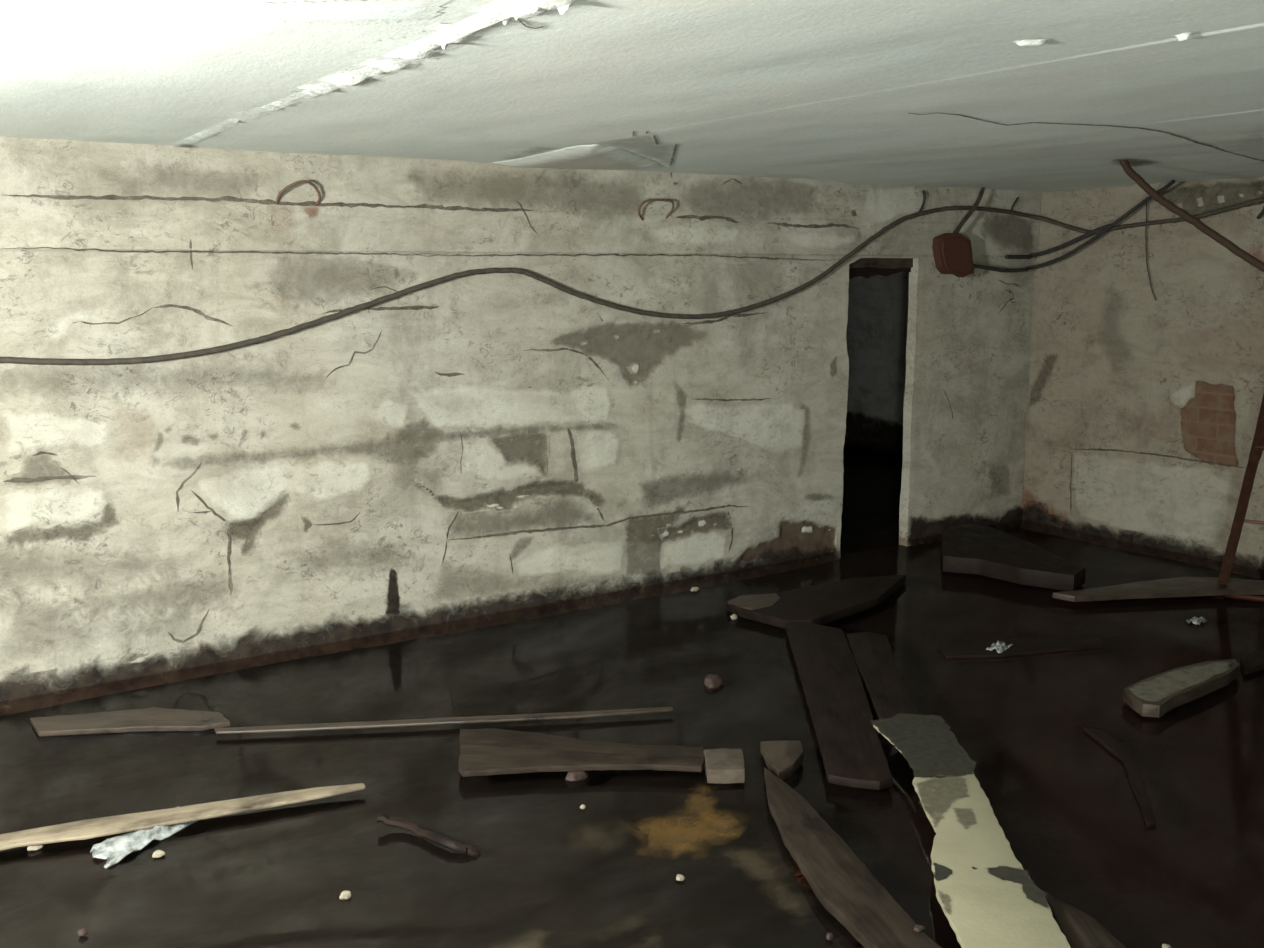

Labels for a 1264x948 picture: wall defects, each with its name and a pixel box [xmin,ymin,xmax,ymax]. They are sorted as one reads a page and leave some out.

crack [909,113,1264,162]
damp [17,457,68,483]
crack [168,610,209,642]
crack [176,462,232,587]
damp [0,475,838,716]
crack [423,428,750,572]
damp [908,503,1264,580]
flaking render [1069,379,1239,550]